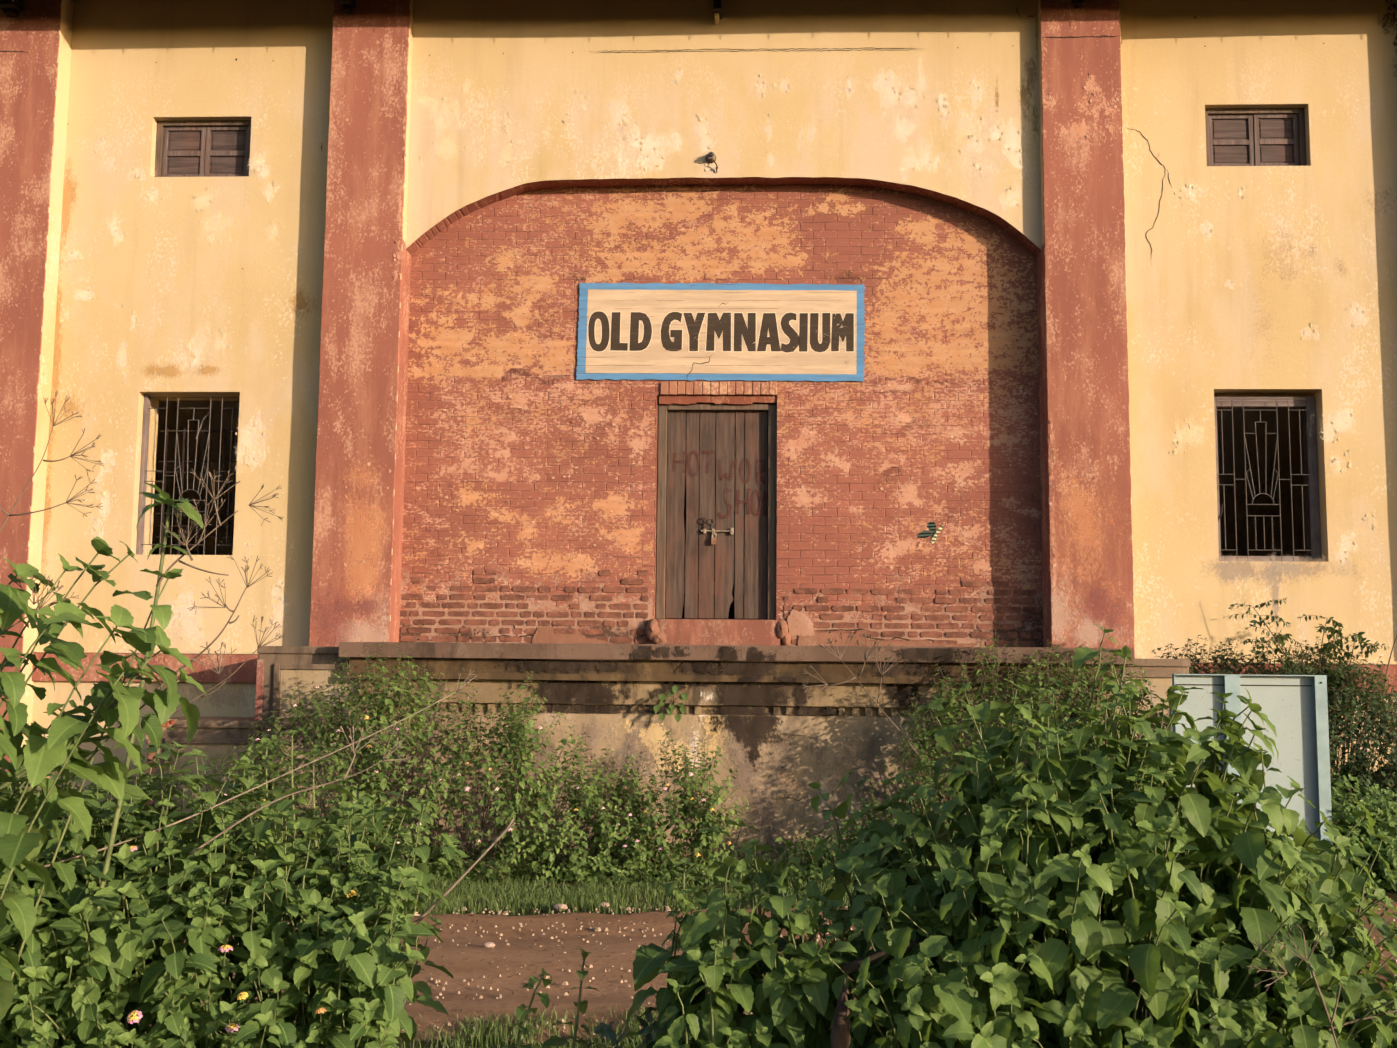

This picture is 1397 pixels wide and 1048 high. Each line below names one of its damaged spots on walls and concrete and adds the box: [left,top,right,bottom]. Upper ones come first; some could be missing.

peeling [845,58,954,181]
crack [1123,122,1171,254]
spalling [392,69,1124,647]
peeling [341,458,391,608]
water stain [491,621,867,836]